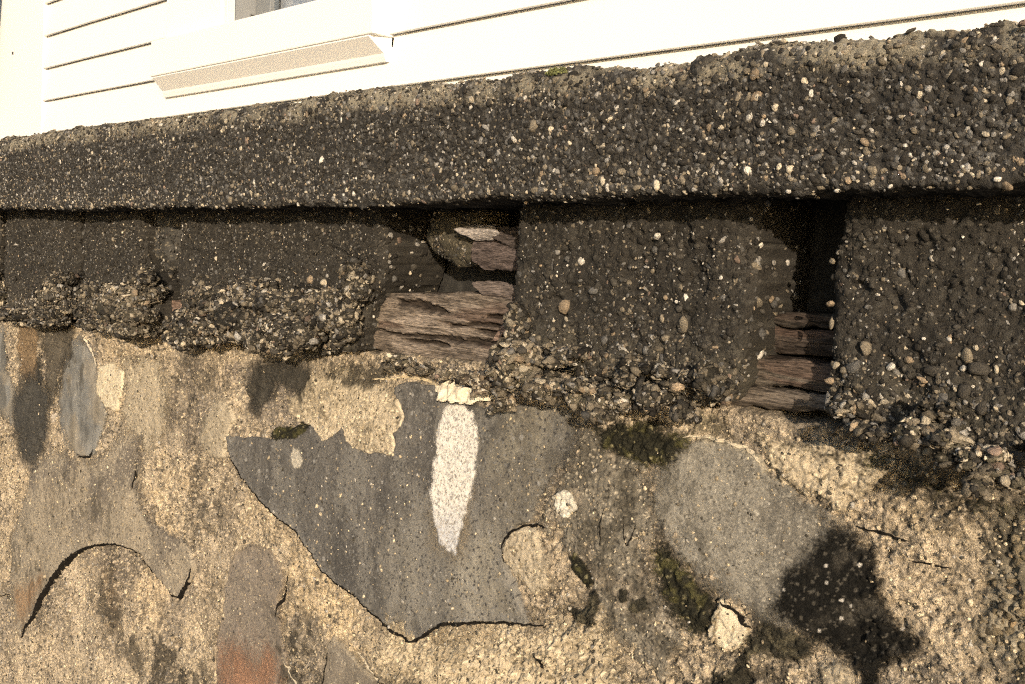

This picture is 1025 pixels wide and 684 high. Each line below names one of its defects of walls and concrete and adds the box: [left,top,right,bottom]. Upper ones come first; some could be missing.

water stain [11,326,74,465]
peeling [82,335,170,458]
water stain [246,362,311,416]
peeling [288,367,495,456]
spalling [552,490,577,518]
spalling [503,526,553,596]
water stain [770,525,926,684]